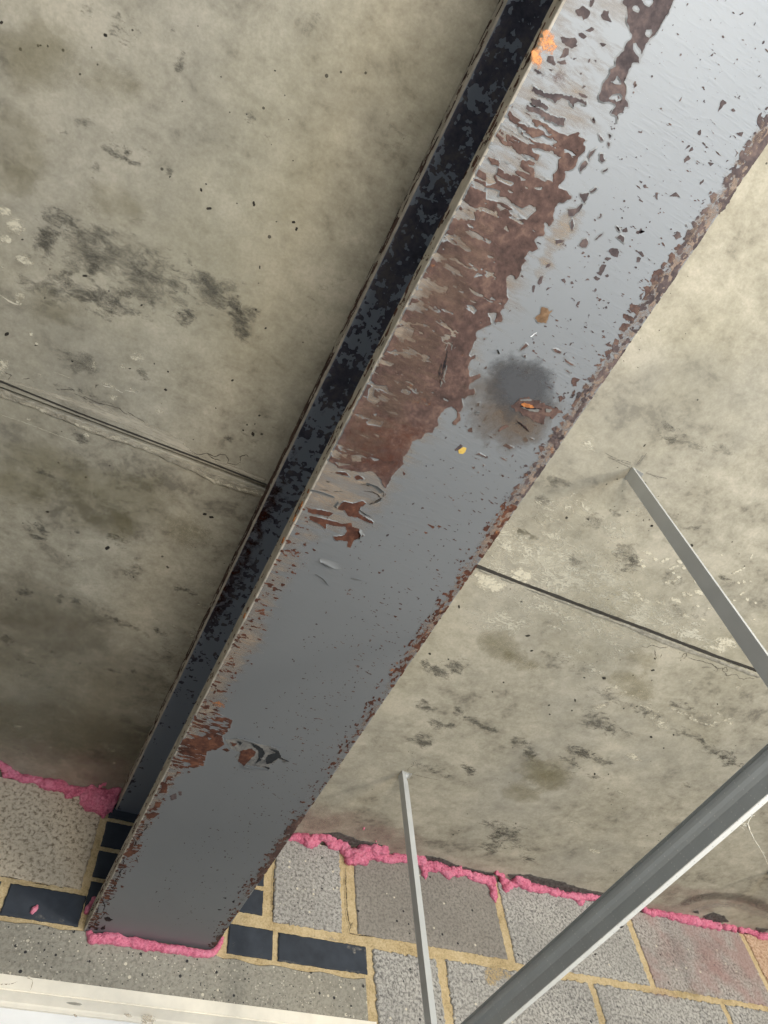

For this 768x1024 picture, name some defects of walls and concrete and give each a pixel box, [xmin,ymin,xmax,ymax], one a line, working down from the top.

corrosion [88,488,318,929]
leakage [200,272,251,332]
corrosion [121,0,503,792]
peeling [0,0,675,728]
corrosion [208,107,768,948]
corrosion [463,0,561,179]